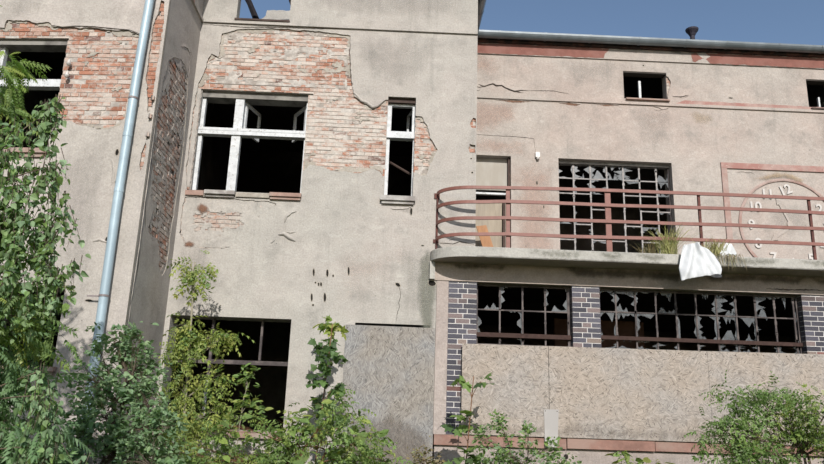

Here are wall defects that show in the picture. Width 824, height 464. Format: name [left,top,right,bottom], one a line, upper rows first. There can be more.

flaking render [0,21,139,130]
crack [477,80,567,94]
peeling [477,43,609,58]
peeling [691,52,824,68]
flaking render [140,2,391,274]
flaking render [413,112,437,176]